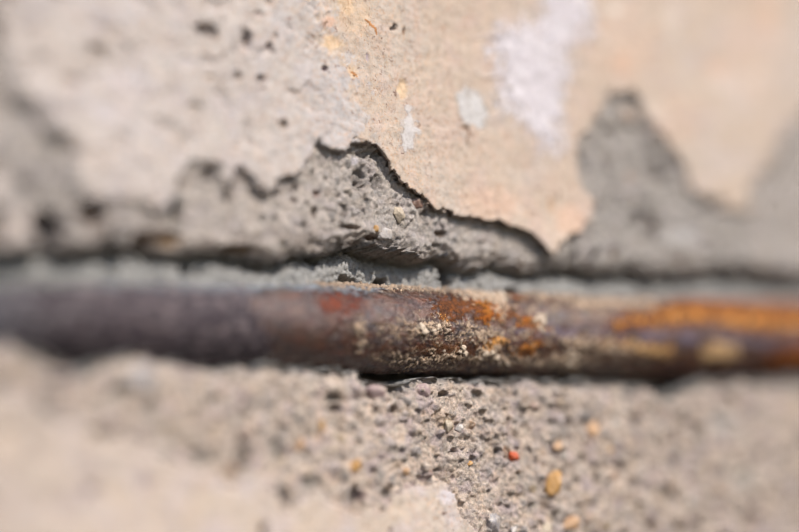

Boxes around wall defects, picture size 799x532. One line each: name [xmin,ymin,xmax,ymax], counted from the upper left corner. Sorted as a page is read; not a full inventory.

spalling [0,40,799,282]
leakage [456,0,599,168]
corrosion [411,291,553,362]
corrosion [574,297,799,377]